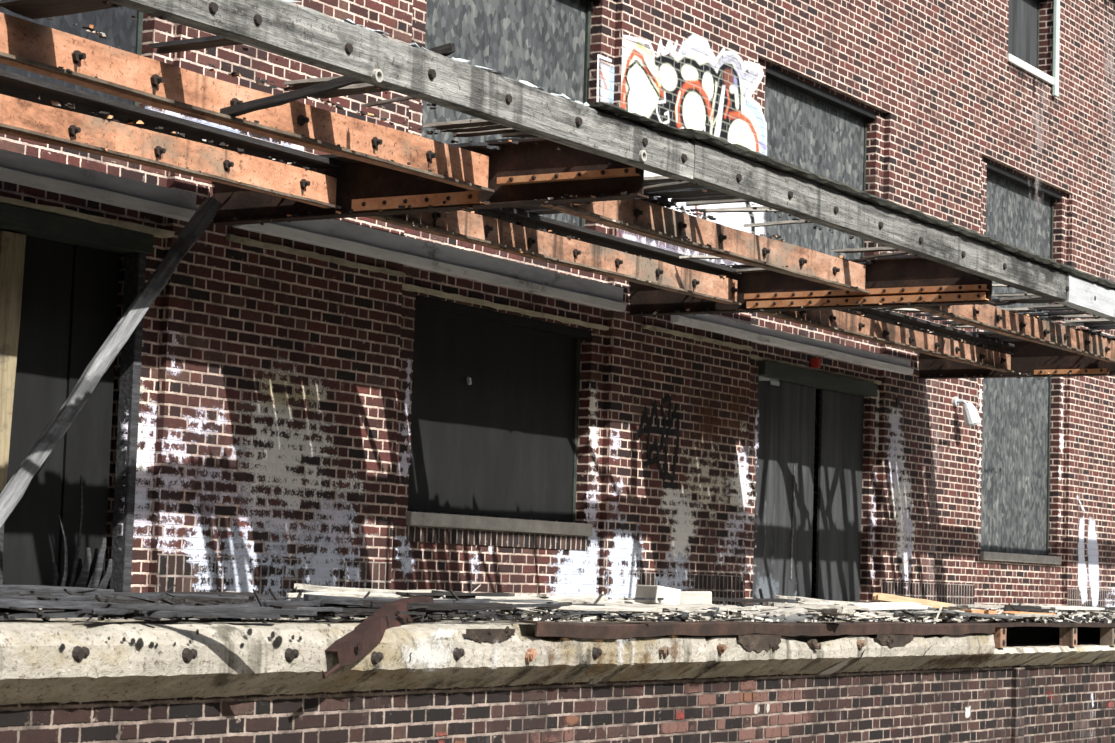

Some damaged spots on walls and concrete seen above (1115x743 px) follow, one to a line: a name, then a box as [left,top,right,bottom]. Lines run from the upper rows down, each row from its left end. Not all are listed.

spalling [466,626,516,644]
spalling [738,634,781,652]